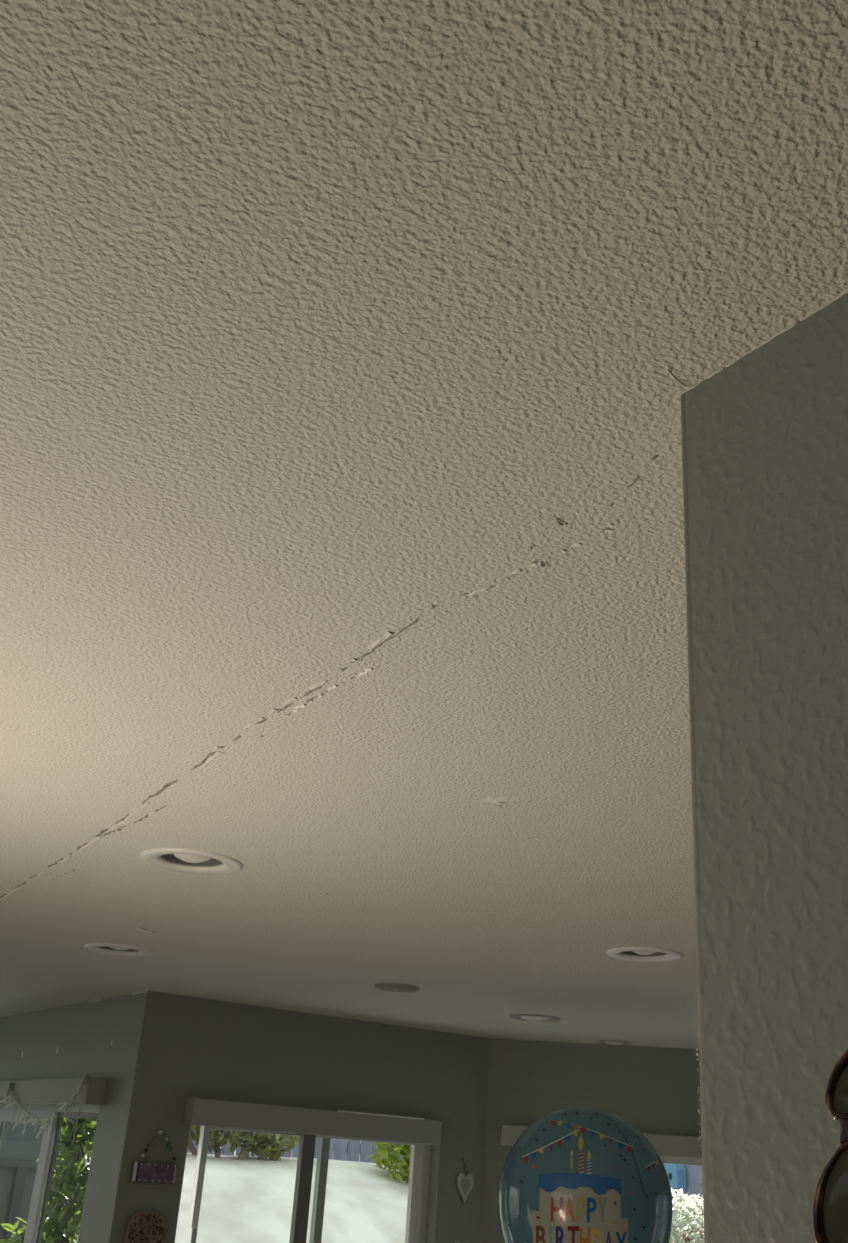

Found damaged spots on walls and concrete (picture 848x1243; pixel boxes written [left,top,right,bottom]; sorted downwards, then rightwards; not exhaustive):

crack [0,455,658,900]